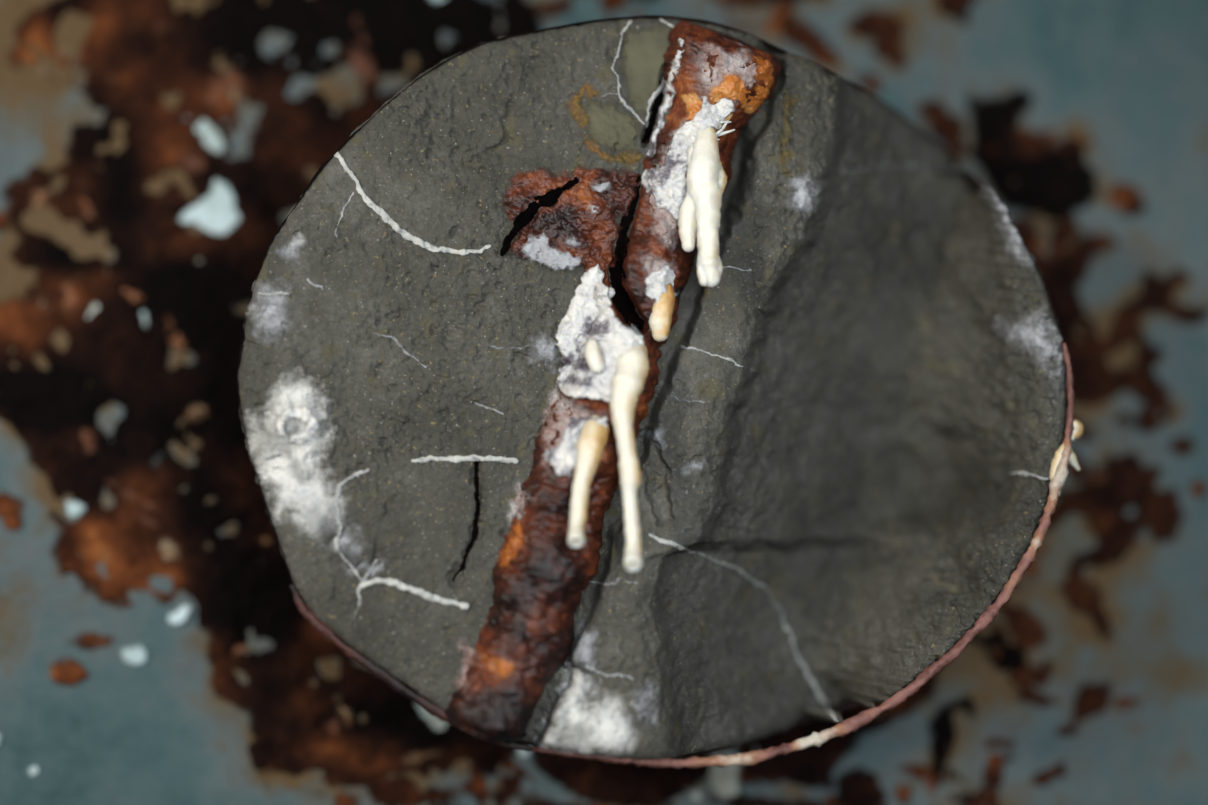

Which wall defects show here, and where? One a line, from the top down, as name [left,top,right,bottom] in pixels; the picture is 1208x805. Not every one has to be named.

crack [601,19,674,144]
rust [937,0,978,26]
crack [334,152,491,256]
crack [609,174,645,333]
damp [642,38,758,303]
rust [0,0,938,805]
damp [537,264,644,478]
rust [919,89,1208,642]
crack [333,454,519,617]
rust [972,546,1055,708]
rust [895,695,1014,805]
rust [1056,682,1136,737]